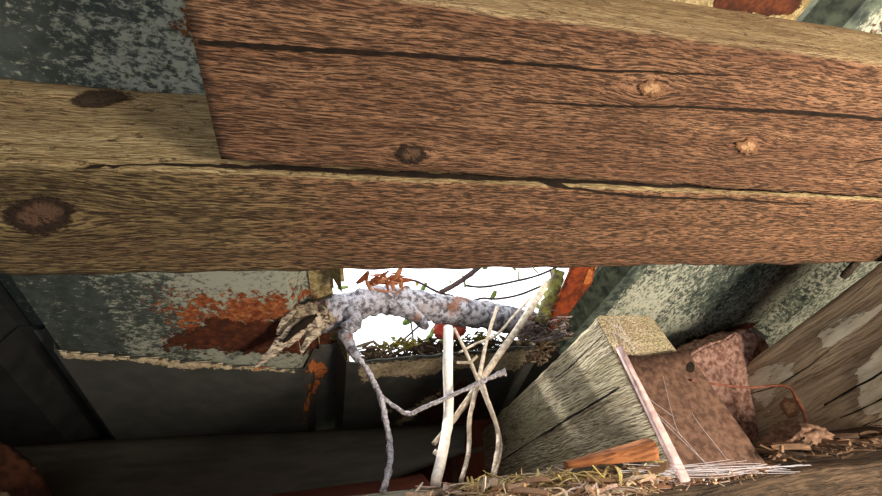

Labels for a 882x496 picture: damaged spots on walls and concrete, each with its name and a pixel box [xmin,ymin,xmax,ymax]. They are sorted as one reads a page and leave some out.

corrosion [714,0,803,17]
crack [198,40,735,76]
crack [76,163,882,205]
peeling [817,303,882,349]
corrosion [140,279,338,430]
peeling [747,362,795,413]
peeling [854,345,882,418]